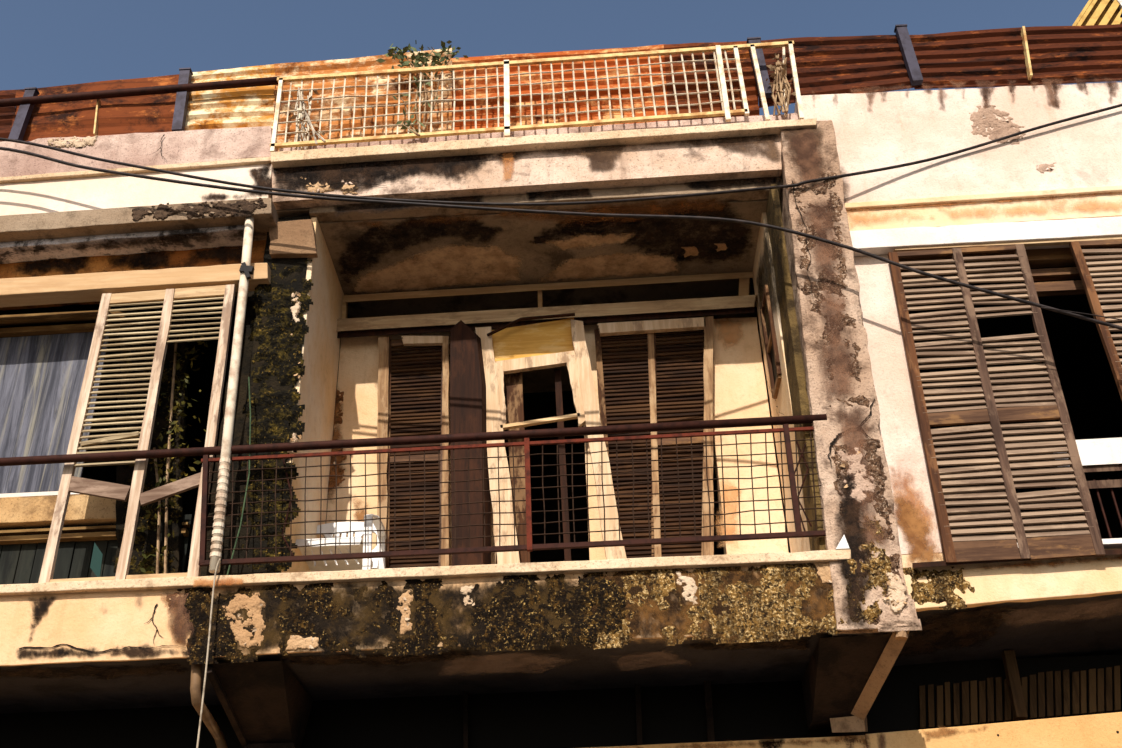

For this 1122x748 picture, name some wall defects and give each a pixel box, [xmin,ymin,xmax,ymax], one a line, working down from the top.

peeling [969,105,1025,144]
damp [651,128,824,185]
peeling [131,198,267,221]
damp [202,144,781,285]
damp [2,229,268,274]
spalling [787,172,870,407]
damp [0,403,885,680]
spalling [831,439,908,625]
damp [894,497,940,562]
crack [19,604,186,653]
peeling [396,590,413,634]
peeling [676,571,698,605]